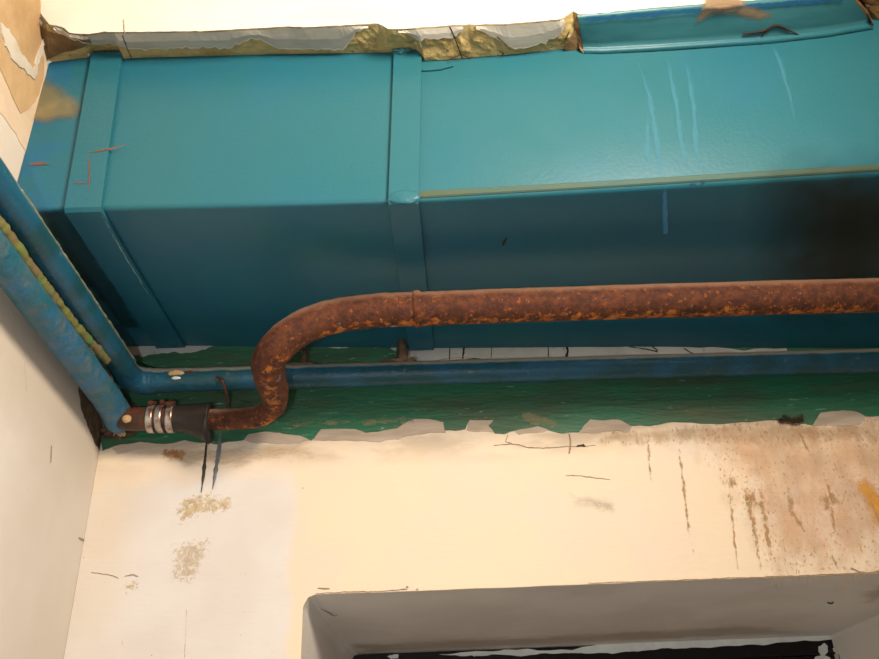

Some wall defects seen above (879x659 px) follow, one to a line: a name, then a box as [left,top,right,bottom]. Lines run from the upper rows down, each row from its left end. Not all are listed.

flaking render [0,0,583,152]
peeling [138,346,212,357]
peeling [168,369,195,380]
flaking render [78,386,198,454]
peeling [244,419,446,444]
peeling [467,420,493,432]
peeling [580,420,632,434]
peeling [814,410,866,426]
rust [163,449,185,460]
damp [178,495,229,519]
damp [704,415,879,572]
rust [859,483,879,519]